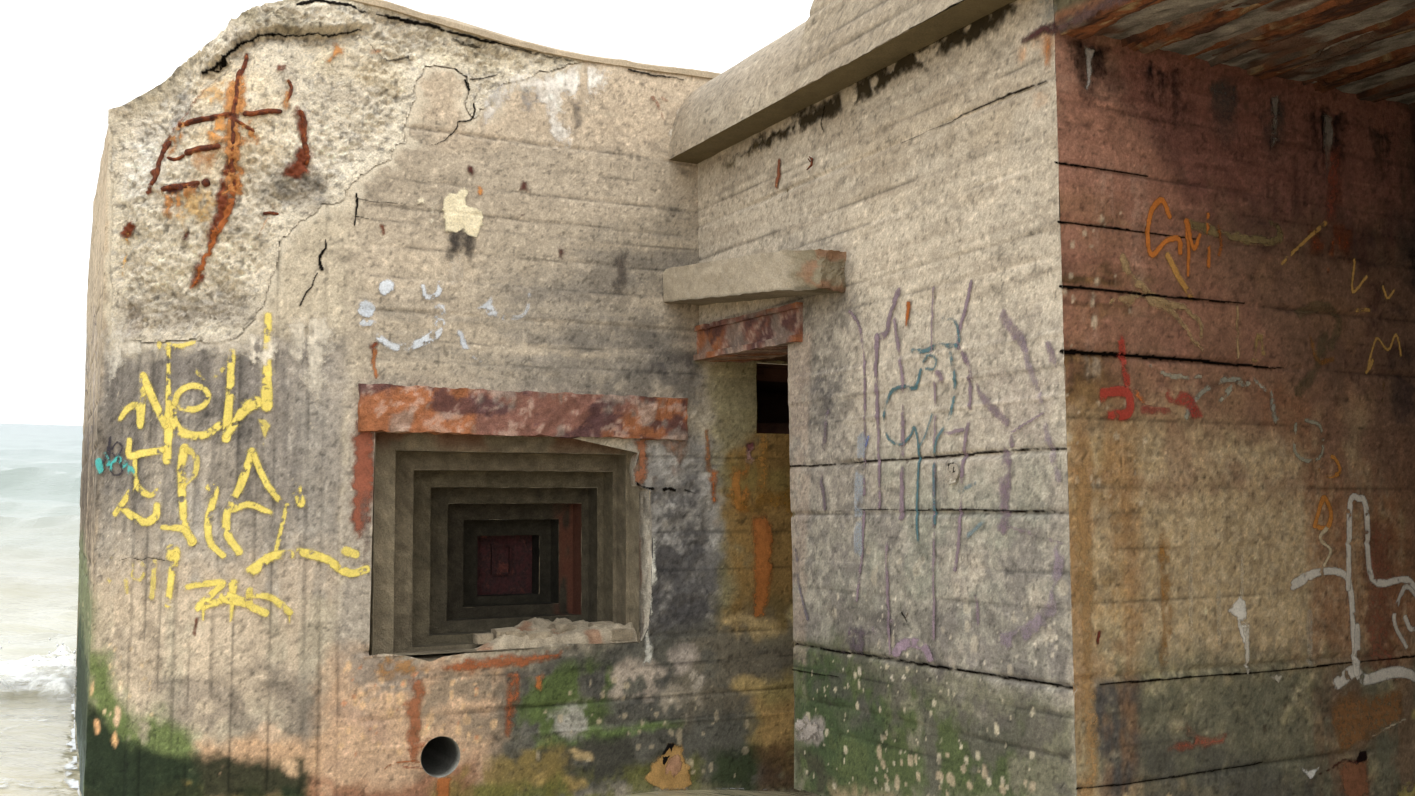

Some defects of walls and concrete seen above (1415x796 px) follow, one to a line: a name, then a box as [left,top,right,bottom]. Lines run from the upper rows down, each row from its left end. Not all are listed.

corrosion [145,53,258,288]
corrosion [283,91,312,178]
spalling [108,0,580,342]
crack [201,0,571,145]
crack [628,69,684,80]
corrosion [1021,0,1129,65]